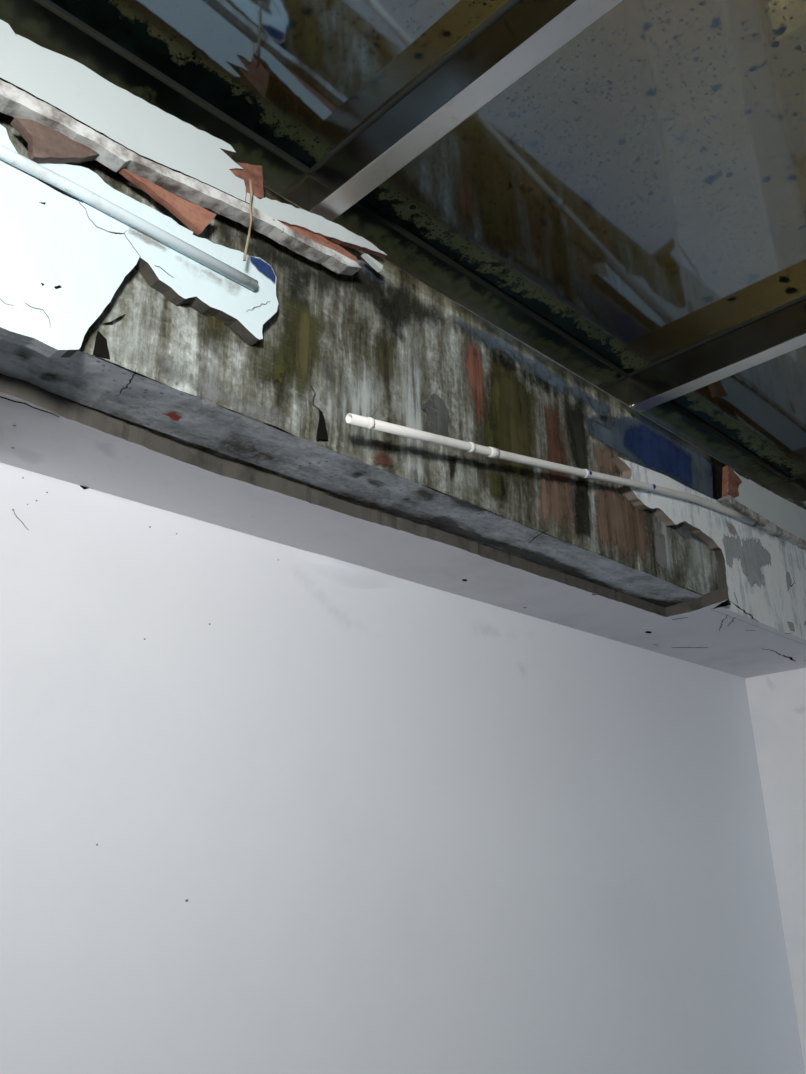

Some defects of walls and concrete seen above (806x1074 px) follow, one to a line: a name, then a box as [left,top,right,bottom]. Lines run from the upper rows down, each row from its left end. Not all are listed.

crack [4,161,174,278]
peeling [251,256,276,284]
leakage [220,224,440,338]
peeling [359,262,384,283]
spalling [93,331,110,359]
spalling [316,410,328,440]
leakage [327,374,374,418]
leakage [404,368,449,446]
peeling [454,316,715,499]
leakage [483,350,716,577]
leakage [325,490,675,608]
peeling [722,535,771,587]